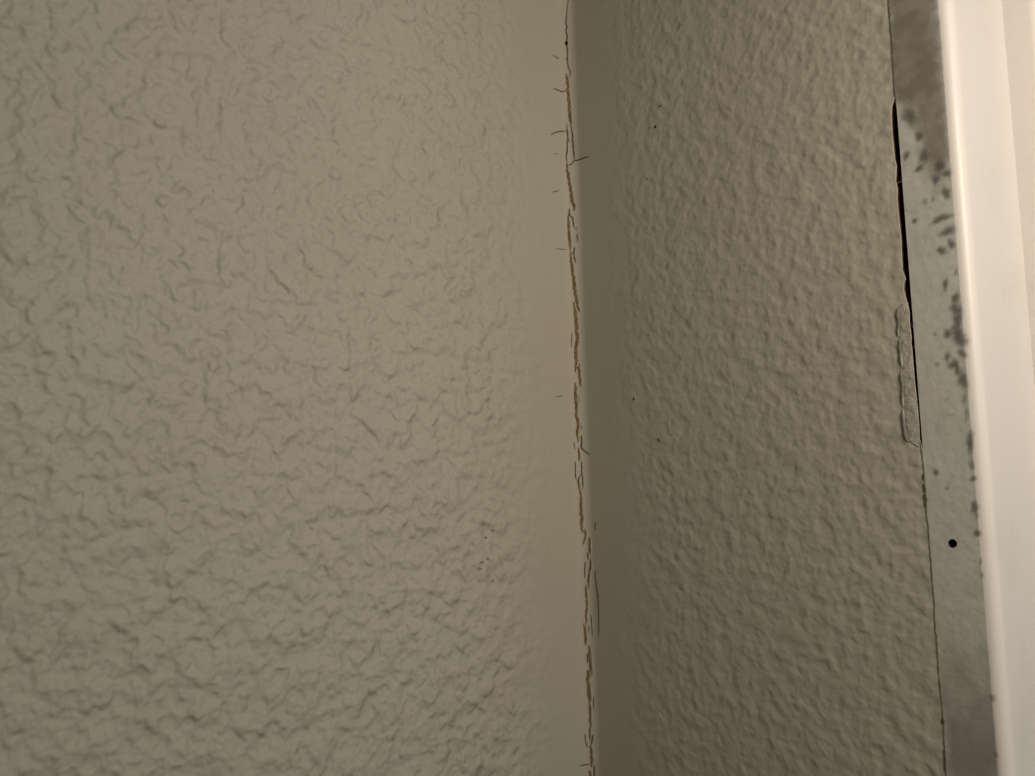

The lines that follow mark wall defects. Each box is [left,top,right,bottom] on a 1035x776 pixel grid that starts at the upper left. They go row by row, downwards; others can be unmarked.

crack [551,0,599,776]
mould [944,281,966,385]